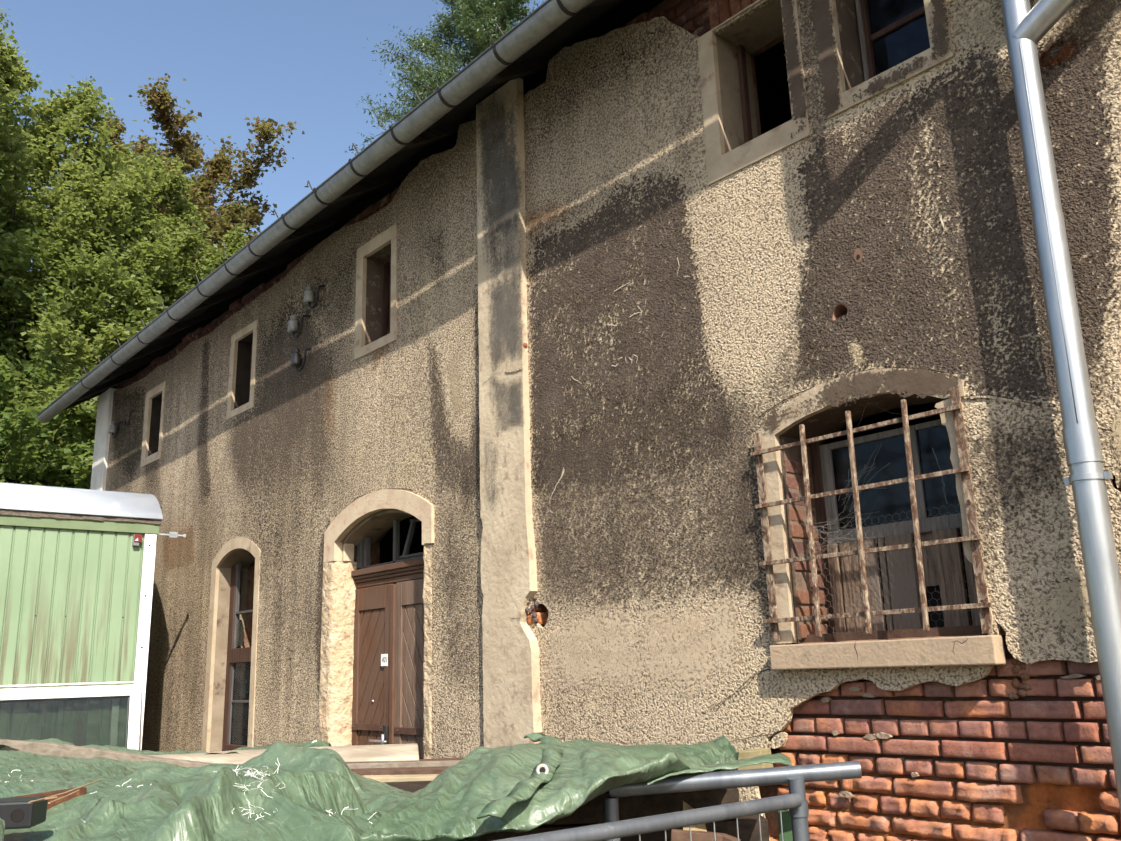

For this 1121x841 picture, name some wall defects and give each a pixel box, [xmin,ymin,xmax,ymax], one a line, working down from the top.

spalling [624,0,757,37]
peeling [779,0,953,139]
spalling [343,186,400,227]
damp [1037,0,1121,409]
spalling [114,239,325,390]
damp [427,0,1070,690]
flaking render [1110,408,1121,492]
flaking render [525,597,745,699]
spalling [769,625,1121,841]